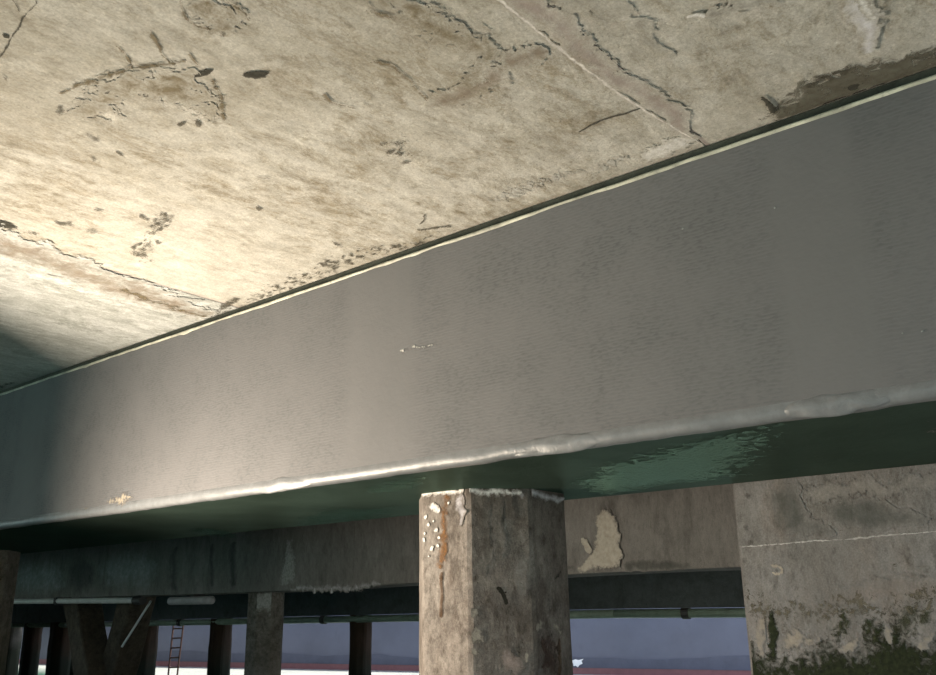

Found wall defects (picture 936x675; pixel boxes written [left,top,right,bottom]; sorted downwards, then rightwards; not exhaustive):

crack [0,1,37,57]
damp [839,0,895,55]
spalling [760,47,936,121]
crack [579,108,640,132]
damp [767,610,778,662]
damp [831,611,850,639]
damp [862,617,877,647]
damp [896,607,931,635]